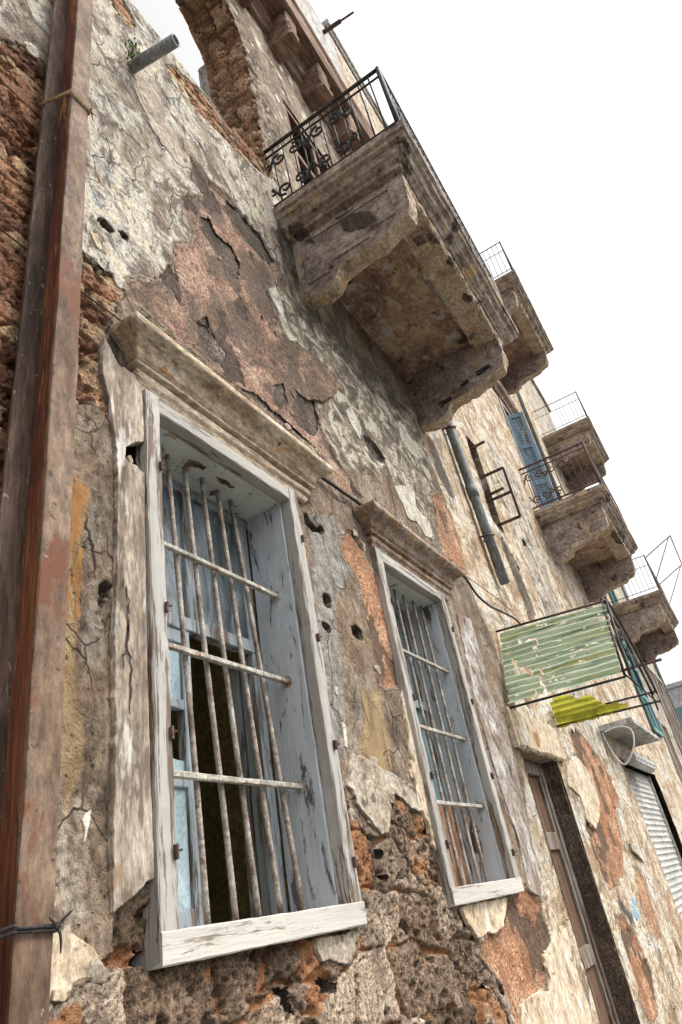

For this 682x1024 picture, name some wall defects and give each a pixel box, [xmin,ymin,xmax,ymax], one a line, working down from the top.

flaking render [0,41,46,497]
flaking render [76,86,362,502]
crack [84,511,96,578]
crack [122,579,133,714]
flaking render [49,529,593,1024]
flaking render [567,725,660,941]
flaking render [614,913,658,1023]